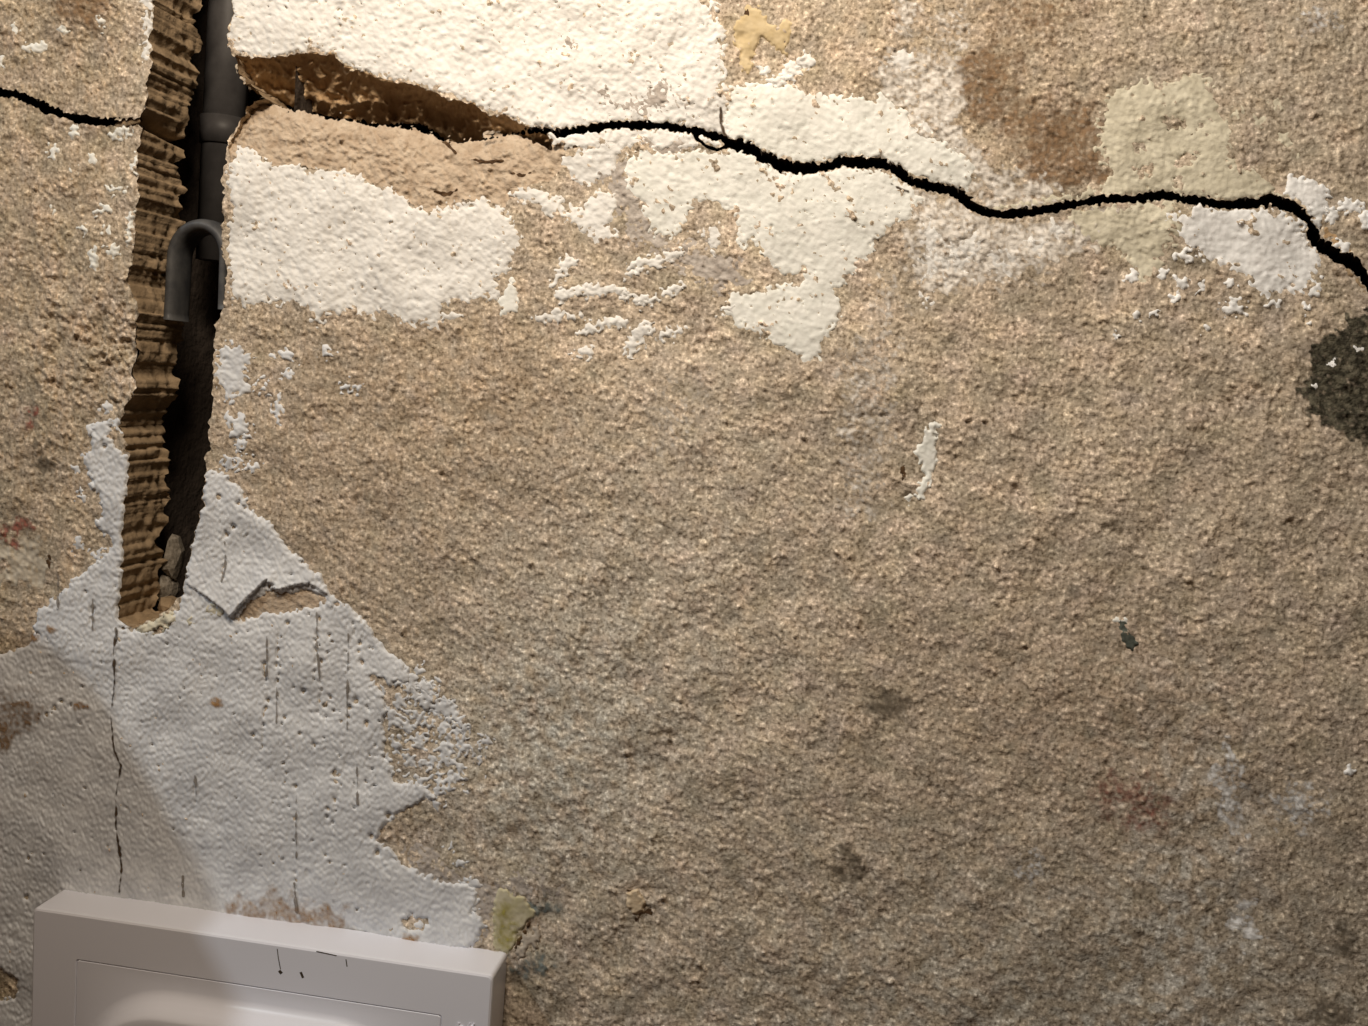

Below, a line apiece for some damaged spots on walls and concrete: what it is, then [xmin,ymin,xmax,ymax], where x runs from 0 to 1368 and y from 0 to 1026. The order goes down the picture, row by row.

crack [0,87,145,130]
crack [248,89,1368,292]
peeling [118,0,1119,636]
damp [1296,308,1368,446]
peeling [70,400,125,503]
peeling [71,536,124,561]
peeling [414,660,440,695]
crack [111,630,123,893]
peeling [441,841,483,912]